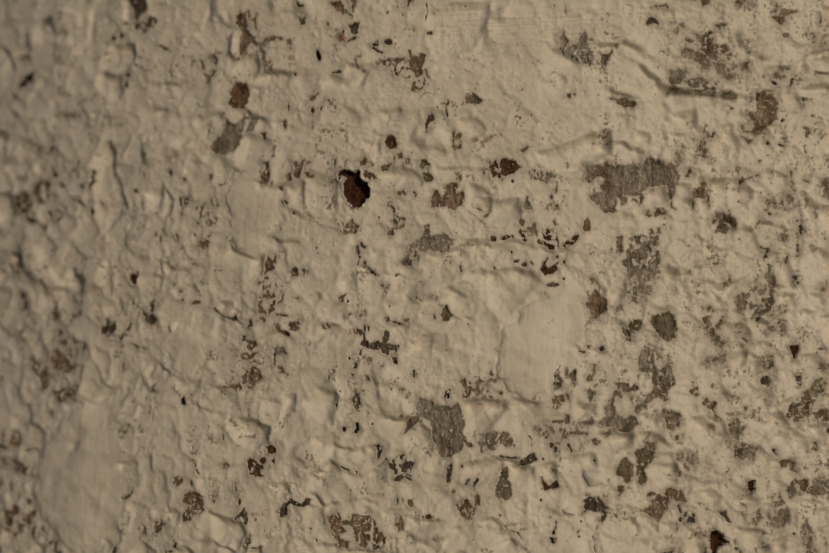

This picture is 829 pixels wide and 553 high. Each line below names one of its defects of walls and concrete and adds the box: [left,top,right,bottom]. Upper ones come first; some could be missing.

peeling [234,10,292,69]
peeling [669,22,749,93]
peeling [210,83,266,156]
peeling [739,66,794,147]
spalling [331,136,409,208]
peeling [431,176,464,210]
peeling [482,158,558,208]
peeling [585,155,690,217]
peeling [616,228,660,304]
peeling [404,371,537,500]
peeling [534,348,680,453]
peeling [327,513,403,550]